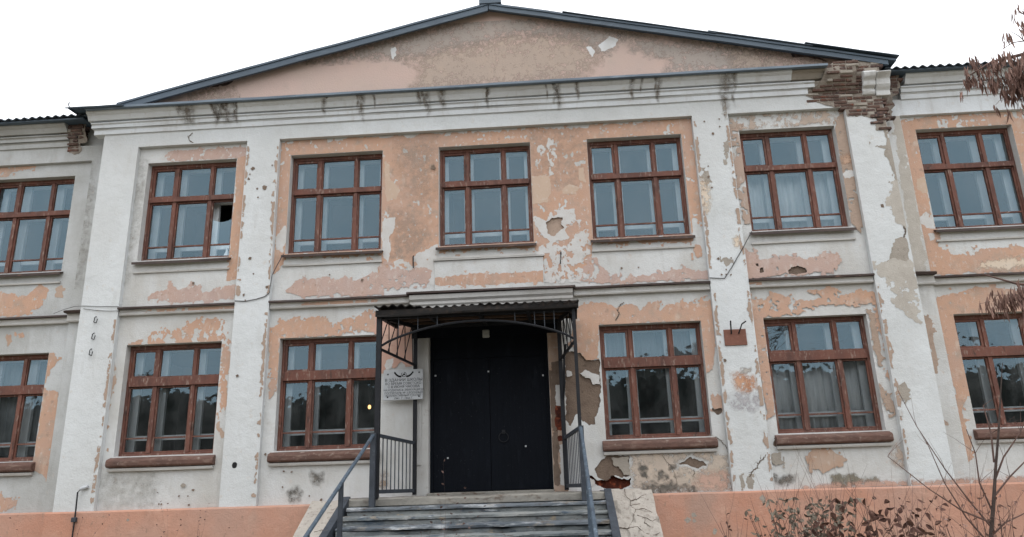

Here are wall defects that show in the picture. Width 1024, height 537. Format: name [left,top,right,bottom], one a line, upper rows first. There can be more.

peeling [0,284,66,317]
peeling [128,118,713,438]
peeling [549,293,727,489]
flaking render [712,54,1024,481]
crack [619,489,659,537]